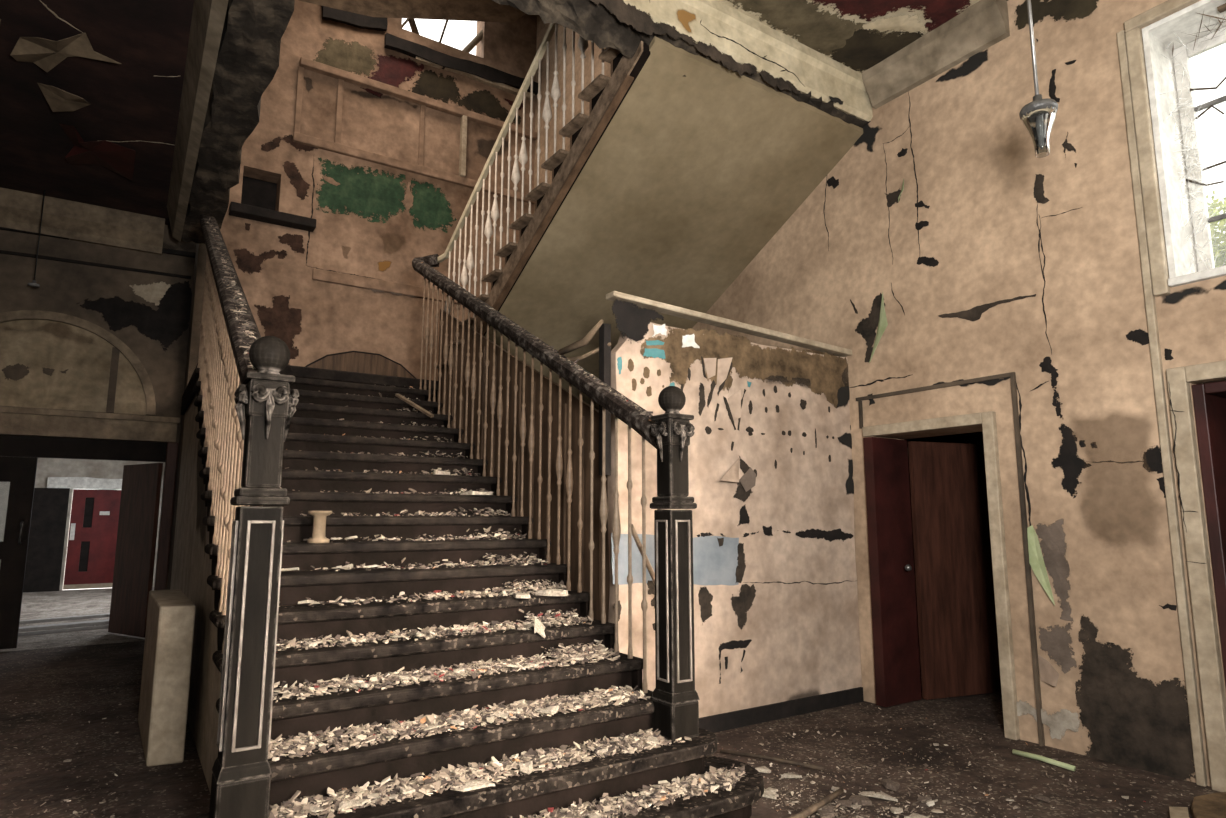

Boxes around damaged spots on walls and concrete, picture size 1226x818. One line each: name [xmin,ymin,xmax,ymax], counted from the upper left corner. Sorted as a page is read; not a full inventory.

spalling [591,0,806,94]
peeling [805,0,971,34]
spalling [1011,0,1099,42]
peeling [1048,60,1076,102]
peeling [261,134,457,233]
peeling [1033,174,1050,204]
spalling [917,256,939,267]
spalling [76,281,192,351]
peeling [850,293,885,362]
crack [1016,204,1079,526]
spalling [612,299,853,684]
spalling [1016,518,1196,781]